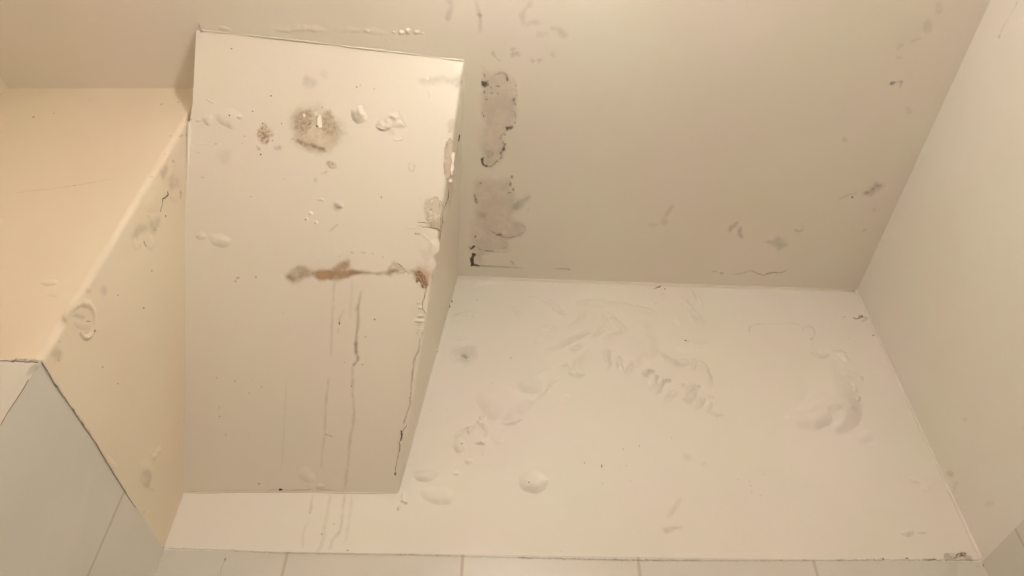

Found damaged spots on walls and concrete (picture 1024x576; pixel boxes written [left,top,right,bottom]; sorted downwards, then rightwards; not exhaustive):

crack [394,429,404,475]